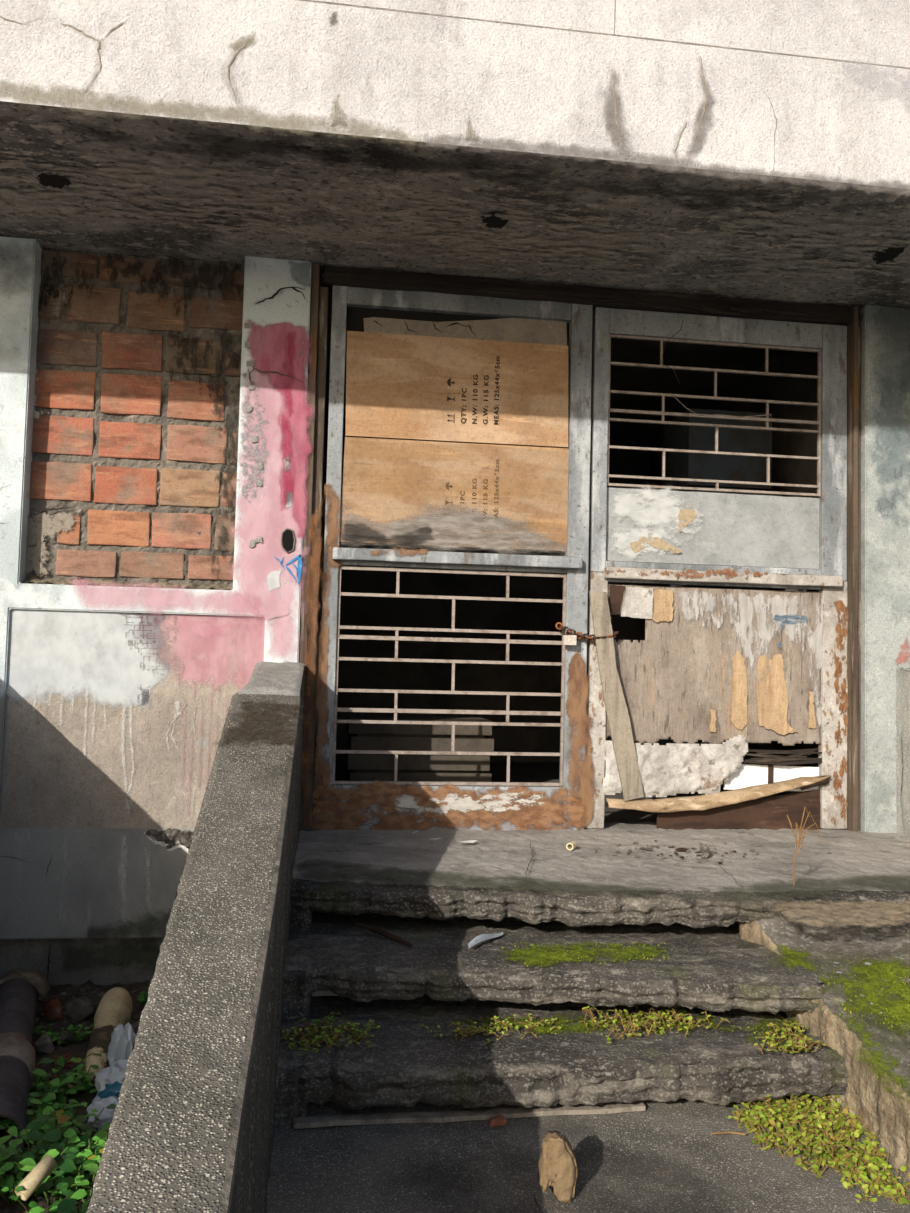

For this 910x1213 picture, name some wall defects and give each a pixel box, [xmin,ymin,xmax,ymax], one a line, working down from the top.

crack [0,16,127,95]
damp [333,103,346,126]
damp [606,75,626,150]
damp [688,56,713,155]
peeling [237,322,269,502]
peeling [267,570,281,591]
spalling [281,528,296,553]
peeling [630,536,682,553]
peeling [678,505,697,534]
rust [301,484,596,831]
peeling [679,590,823,727]
rust [831,600,848,825]